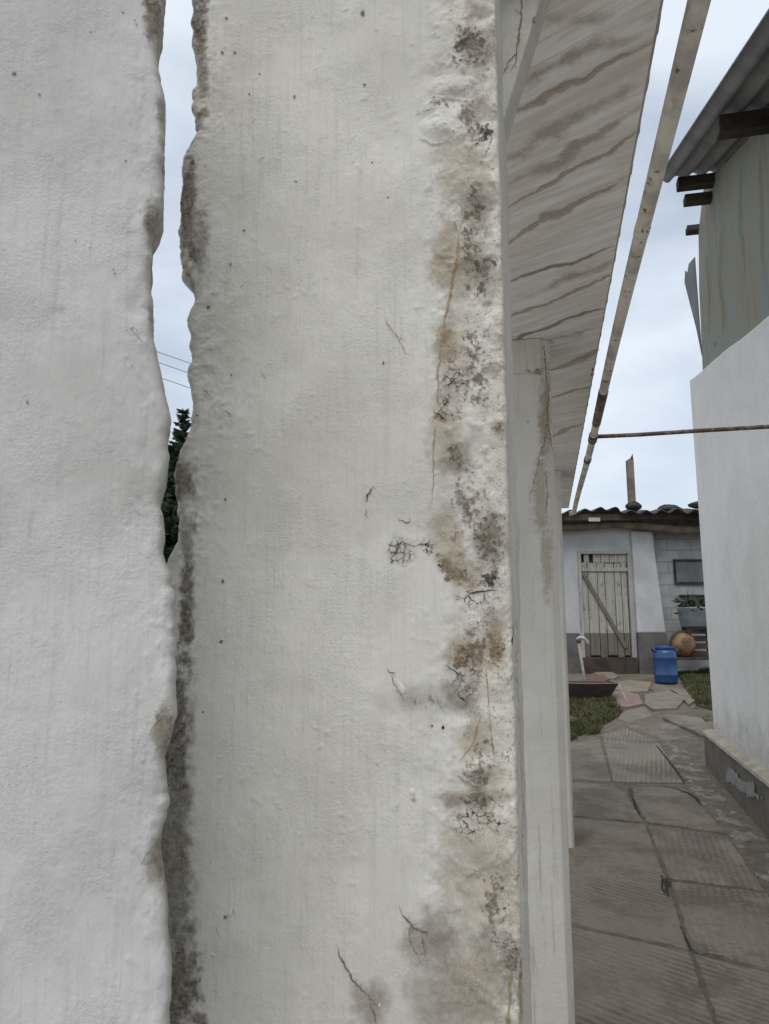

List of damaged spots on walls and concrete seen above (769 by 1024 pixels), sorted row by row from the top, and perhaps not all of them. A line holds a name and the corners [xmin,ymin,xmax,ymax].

damp [452,24,489,69]
damp [453,91,494,152]
damp [454,178,497,297]
corrosion [436,223,459,402]
damp [454,326,495,406]
crack [386,518,435,567]
damp [447,446,506,578]
damp [456,620,486,692]
damp [463,737,500,804]
crack [448,805,507,841]
damp [482,872,510,947]
damp [507,966,523,1024]